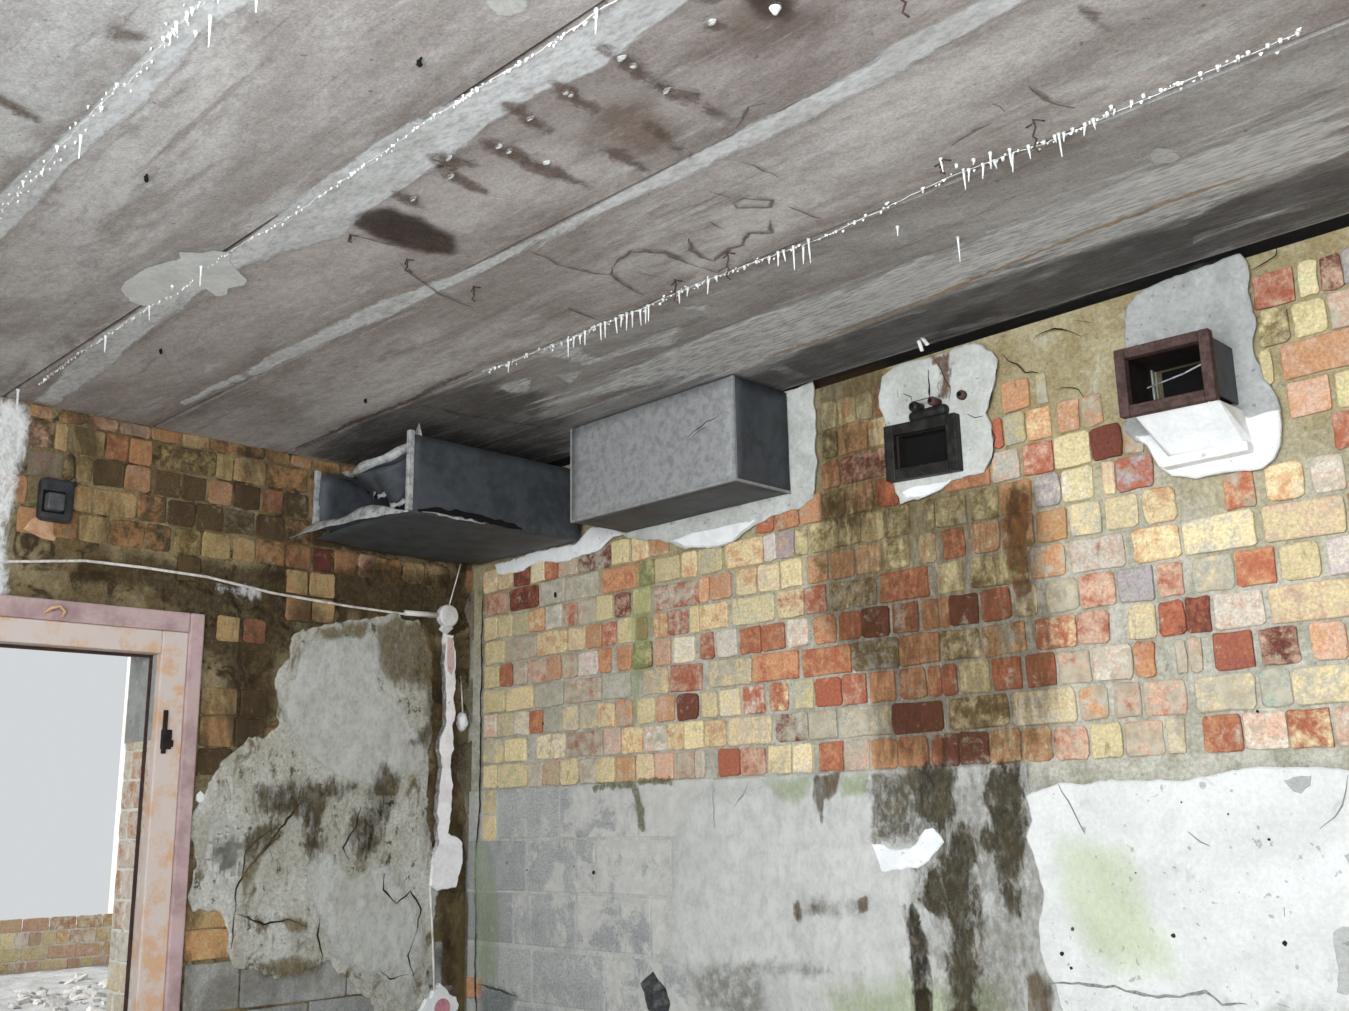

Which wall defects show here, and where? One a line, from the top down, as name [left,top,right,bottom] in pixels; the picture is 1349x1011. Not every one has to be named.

damp [0,0,219,219]
damp [38,0,617,386]
crack [358,236,473,308]
crack [531,162,821,295]
crack [736,103,766,128]
damp [749,0,791,19]
damp [314,27,1349,465]
damp [80,555,511,1011]
damp [871,760,1029,1011]
crack [1047,982,1247,1006]